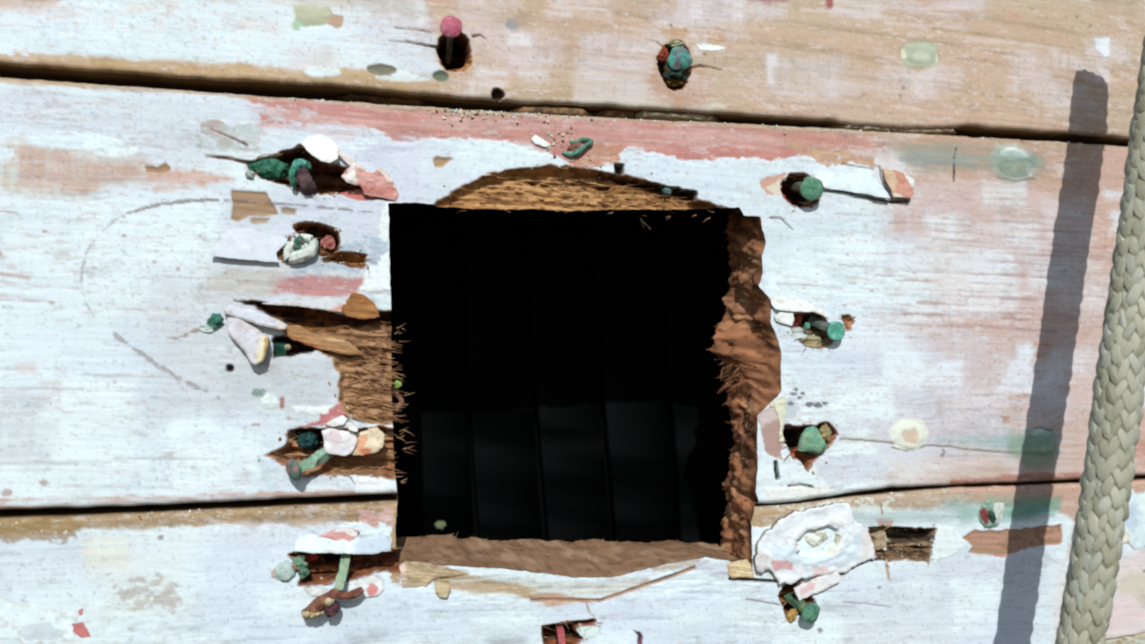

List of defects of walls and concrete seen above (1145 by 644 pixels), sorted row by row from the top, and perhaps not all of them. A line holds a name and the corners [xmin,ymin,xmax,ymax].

peeling [261,88,875,201]
peeling [812,169,915,198]
peeling [210,190,298,262]
peeling [262,296,347,312]
peeling [768,395,787,442]
crack [839,438,1019,459]
peeling [295,527,391,554]
peeling [1122,488,1145,549]
peeling [304,574,384,603]
crack [531,566,698,618]
peeling [0,596,91,644]
peeling [576,626,601,638]